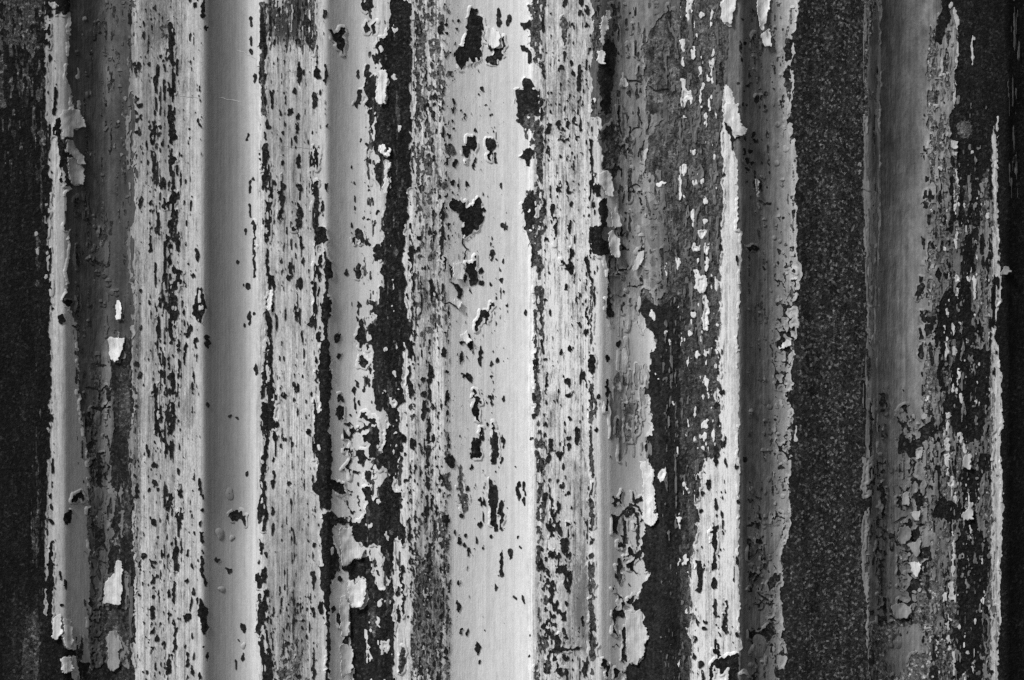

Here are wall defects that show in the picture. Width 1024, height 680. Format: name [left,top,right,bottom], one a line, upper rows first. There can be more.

peeling [370,70,388,115]
peeling [380,144,391,194]
peeling [485,26,501,64]
peeling [50,0,142,674]
peeling [443,262,465,280]
peeling [587,0,803,680]
peeling [862,0,1012,678]
peeling [332,525,366,680]